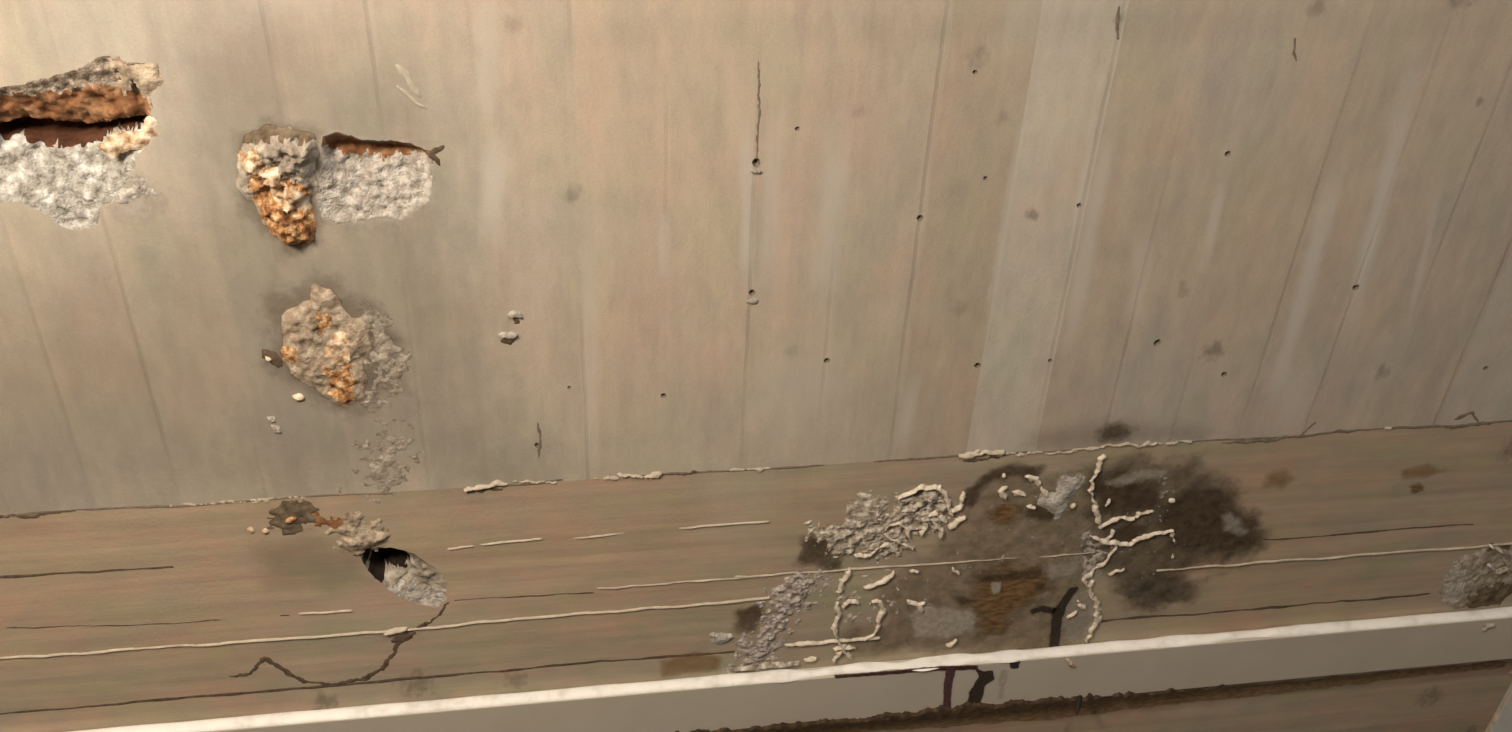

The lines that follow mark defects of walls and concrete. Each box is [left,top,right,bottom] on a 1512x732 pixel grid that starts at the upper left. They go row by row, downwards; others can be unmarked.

spalling [0,56,164,230]
spalling [317,132,445,225]
spalling [360,547,448,608]
leakage [721,460,1260,709]
crack [229,602,449,686]
rust [675,661,1506,732]